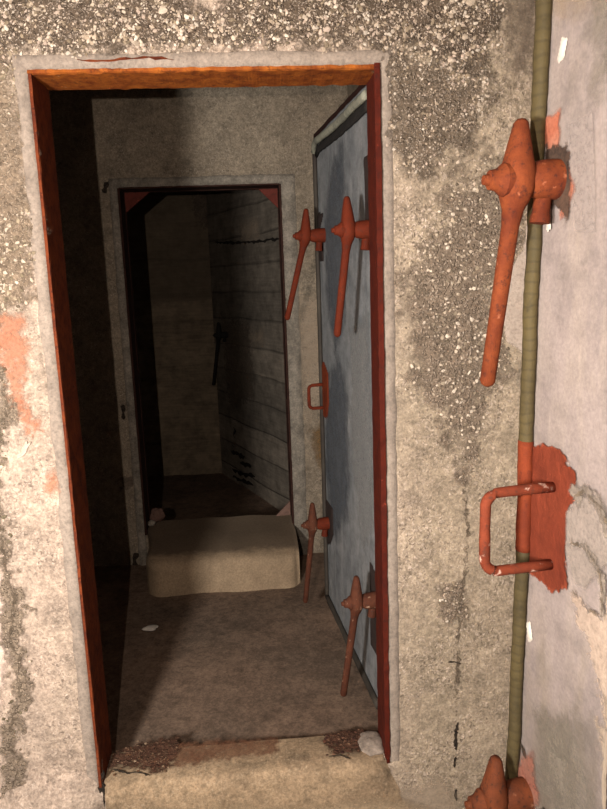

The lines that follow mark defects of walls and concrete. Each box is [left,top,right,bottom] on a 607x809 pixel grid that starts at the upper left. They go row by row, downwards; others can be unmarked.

spalling [0,0,527,485]
rust [0,313,38,434]
crack [98,770,106,803]
spalling [436,581,469,623]
crack [448,491,470,768]
peeling [571,592,607,809]